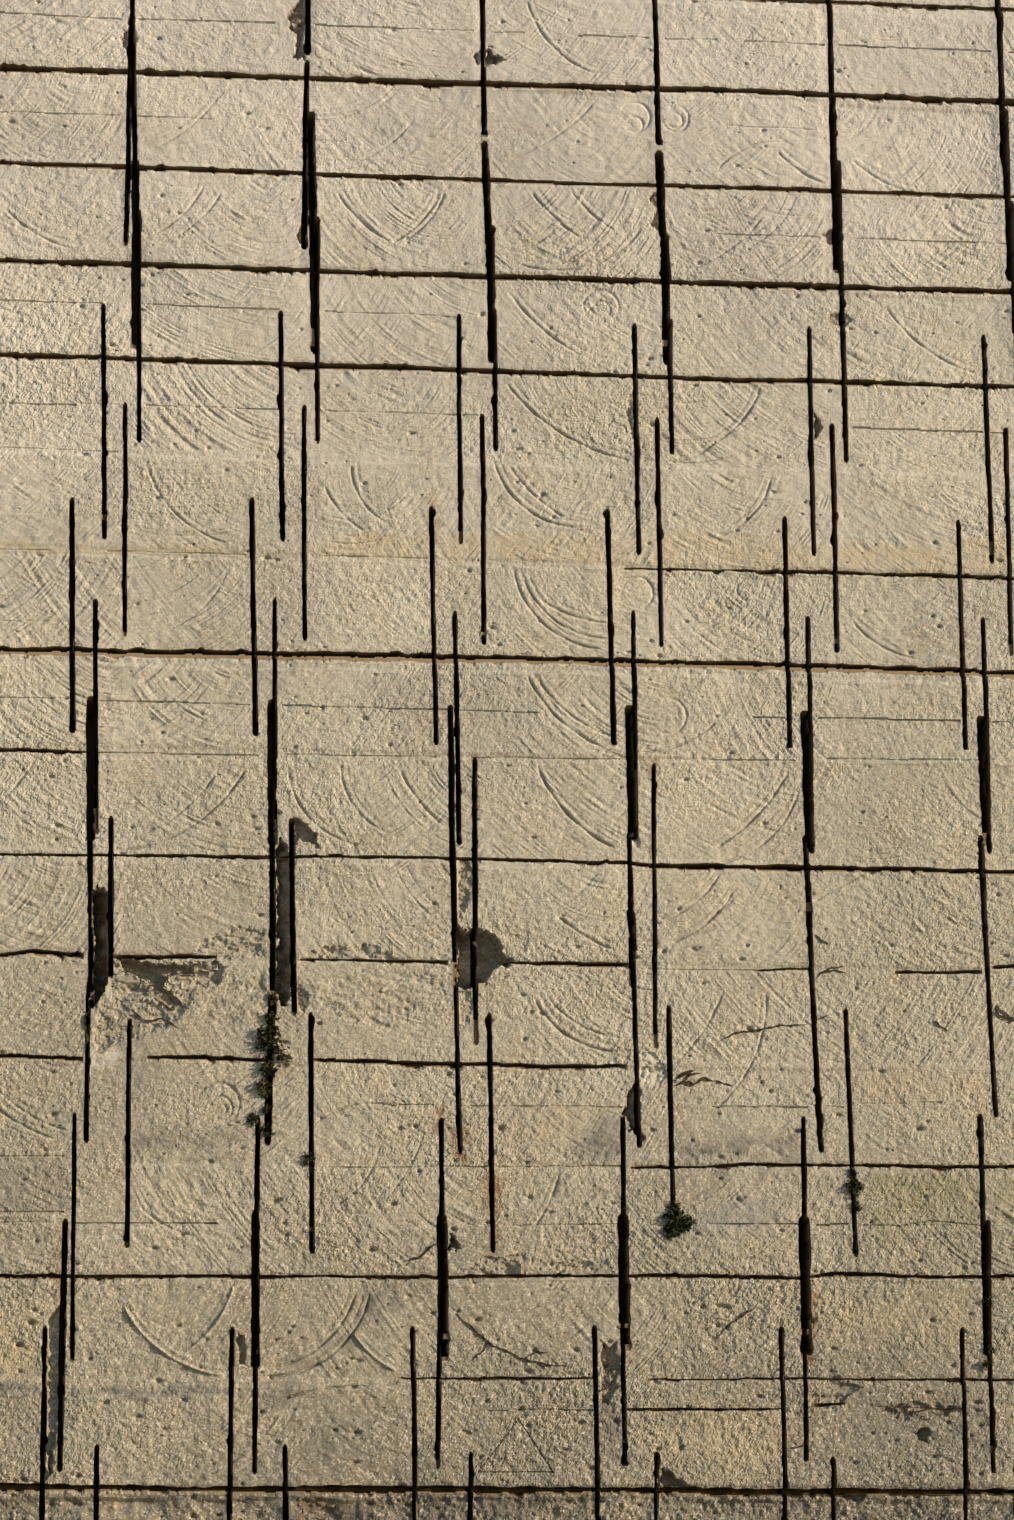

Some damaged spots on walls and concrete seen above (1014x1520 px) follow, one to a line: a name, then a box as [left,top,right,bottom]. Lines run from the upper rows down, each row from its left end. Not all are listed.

spalling [286,0,307,62]
leakage [662,1110,813,1249]